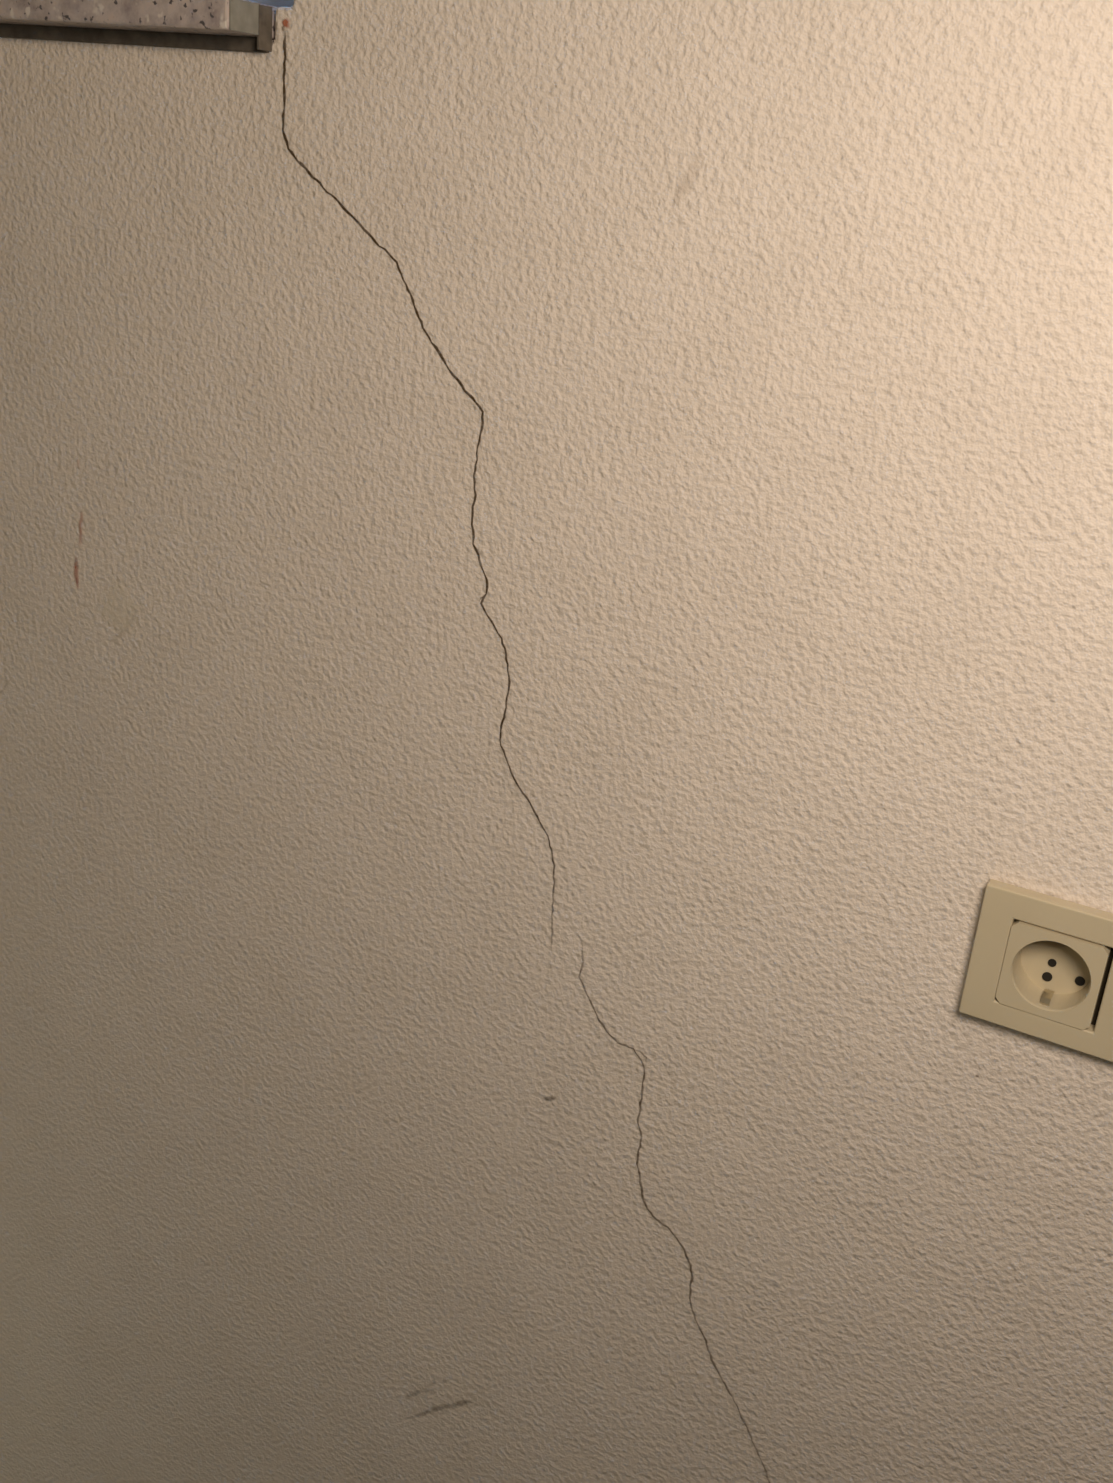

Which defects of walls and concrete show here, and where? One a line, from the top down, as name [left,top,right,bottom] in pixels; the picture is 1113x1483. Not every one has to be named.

crack [282,37,555,912]
crack [580,969,765,1469]